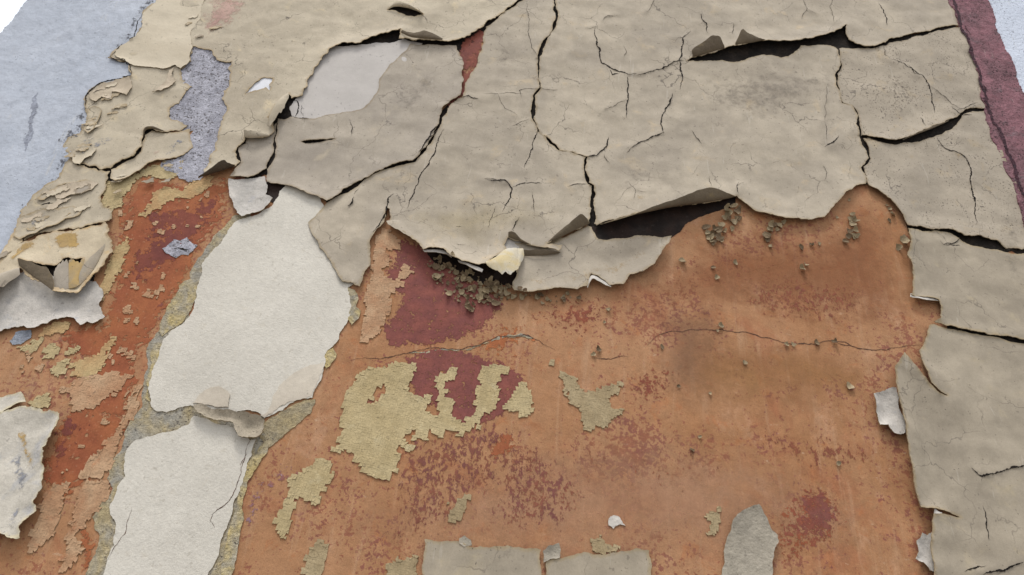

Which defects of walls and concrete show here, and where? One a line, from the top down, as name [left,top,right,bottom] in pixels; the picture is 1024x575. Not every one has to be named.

crack [263,98,304,175]
crack [325,0,734,230]
peeling [308,0,1024,340]
crack [824,48,903,184]
crack [879,0,1024,245]
corrosion [80,530,96,573]
corrosion [43,177,229,501]
flaking render [0,0,534,575]
peeling [386,515,652,575]
peeling [704,504,779,575]
corrosion [771,474,849,563]
peeling [874,324,1024,575]